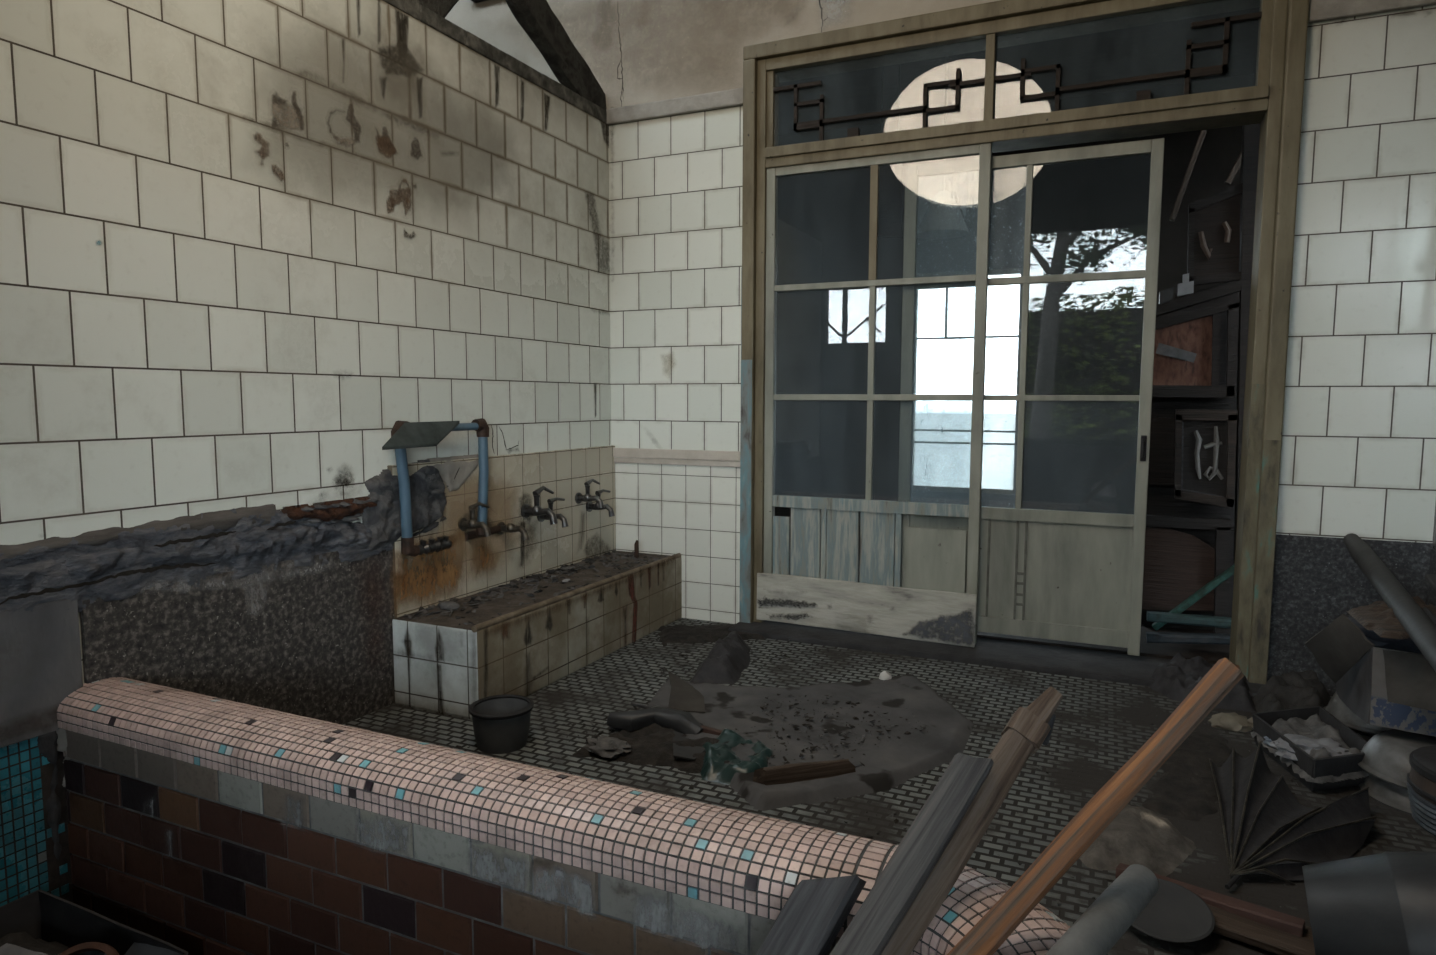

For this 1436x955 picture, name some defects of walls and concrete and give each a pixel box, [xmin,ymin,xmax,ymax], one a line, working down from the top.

spalling [0,496,393,613]
corrosion [395,483,512,603]
corrosion [624,563,664,645]